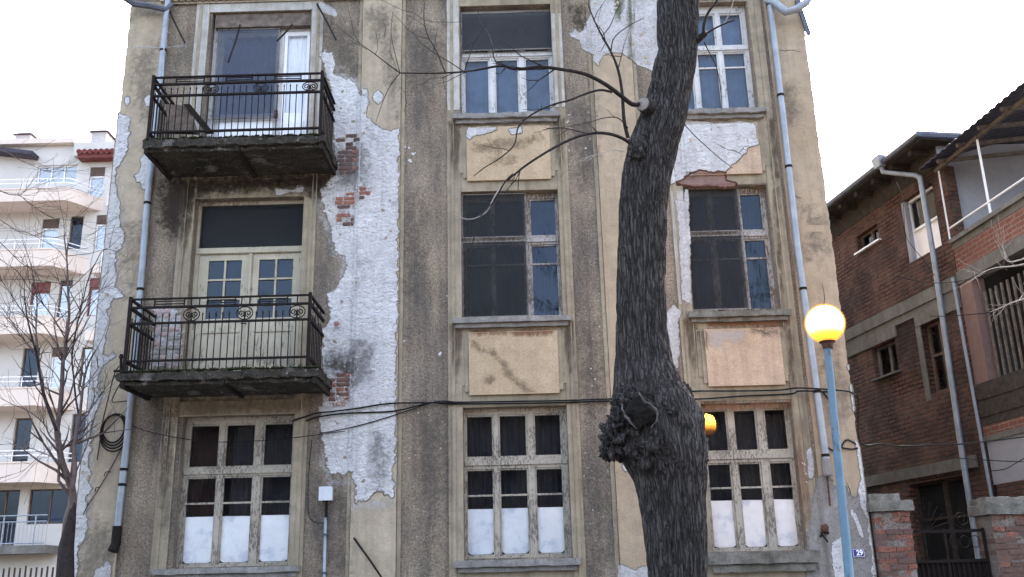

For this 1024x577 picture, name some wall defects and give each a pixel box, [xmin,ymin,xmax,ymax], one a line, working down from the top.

peeling [568,0,658,72]
peeling [74,96,132,577]
damp [158,149,366,246]
damp [324,340,368,380]
peeling [318,49,416,505]
peeling [465,125,523,140]
peeling [667,120,760,369]
flaking render [802,440,877,577]